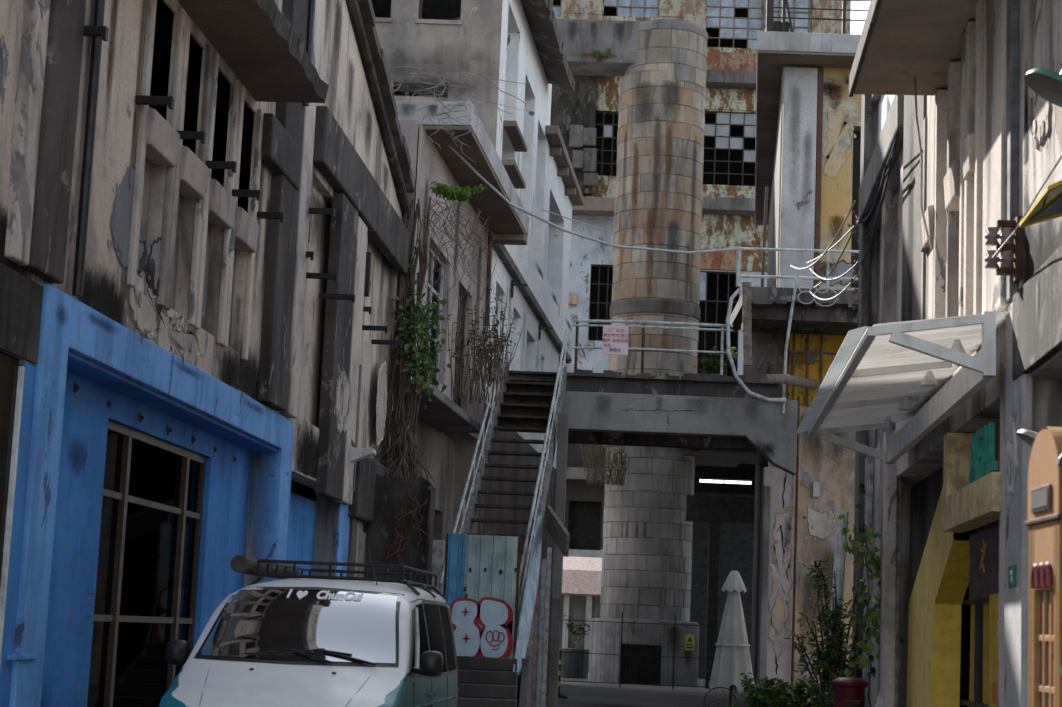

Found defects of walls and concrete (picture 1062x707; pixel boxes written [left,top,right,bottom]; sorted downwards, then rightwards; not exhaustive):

flaking render [822,101,856,187]
leakage [0,217,26,275]
flaking render [107,165,208,367]
crack [622,409,707,426]
crack [777,474,789,580]
flaking render [767,497,837,661]